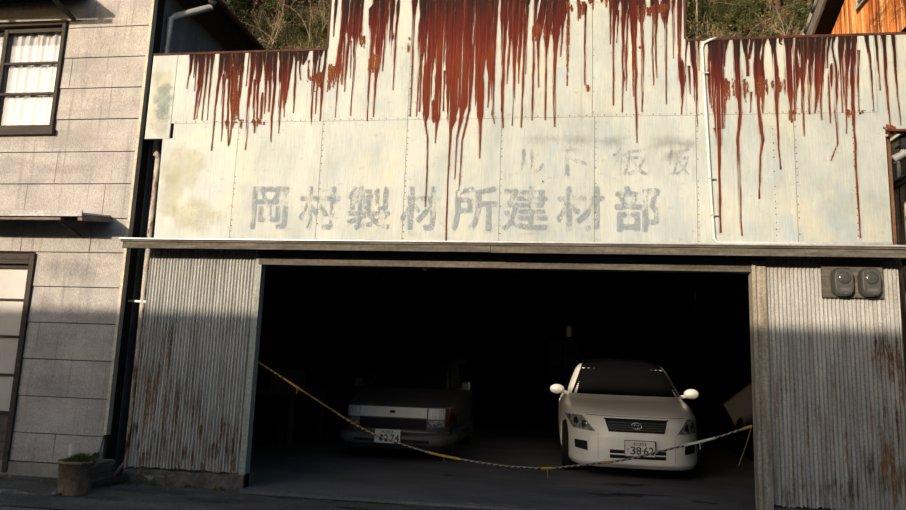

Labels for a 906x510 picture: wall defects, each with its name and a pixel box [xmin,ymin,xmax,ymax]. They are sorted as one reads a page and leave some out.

rust [187,0,400,151]
rust [407,0,901,241]
rust [132,332,241,473]
rust [872,336,904,439]